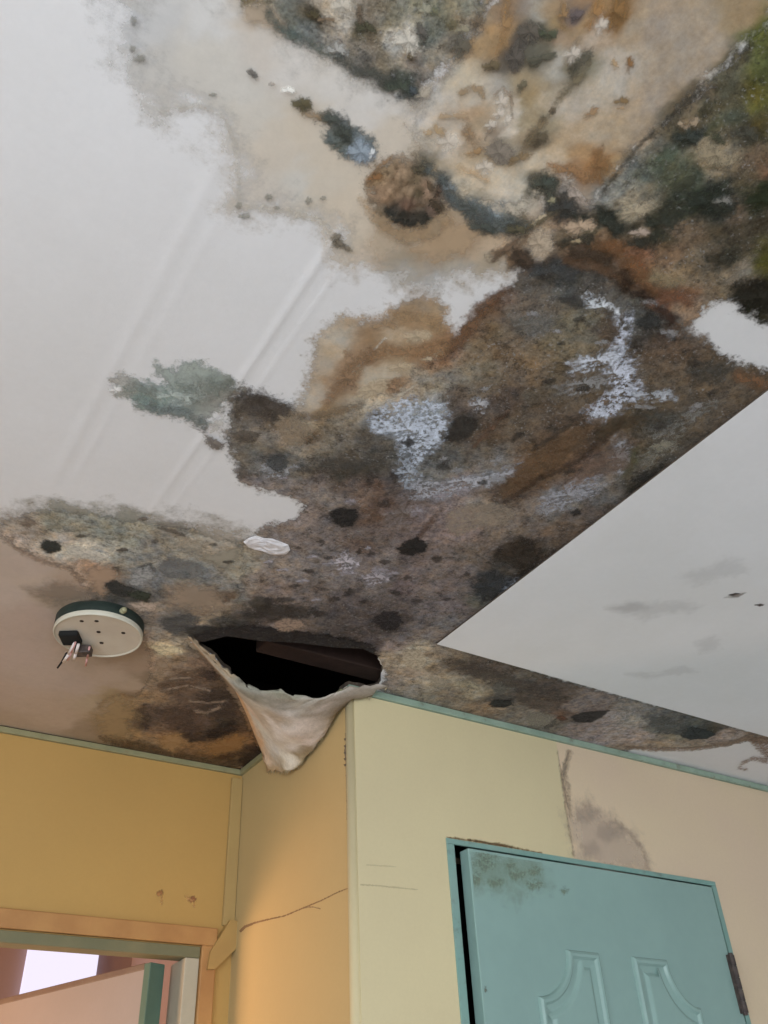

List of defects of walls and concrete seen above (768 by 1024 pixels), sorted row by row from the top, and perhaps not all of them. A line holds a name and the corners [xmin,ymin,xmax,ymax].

damp [0,0,768,770]
crack [239,889,345,932]